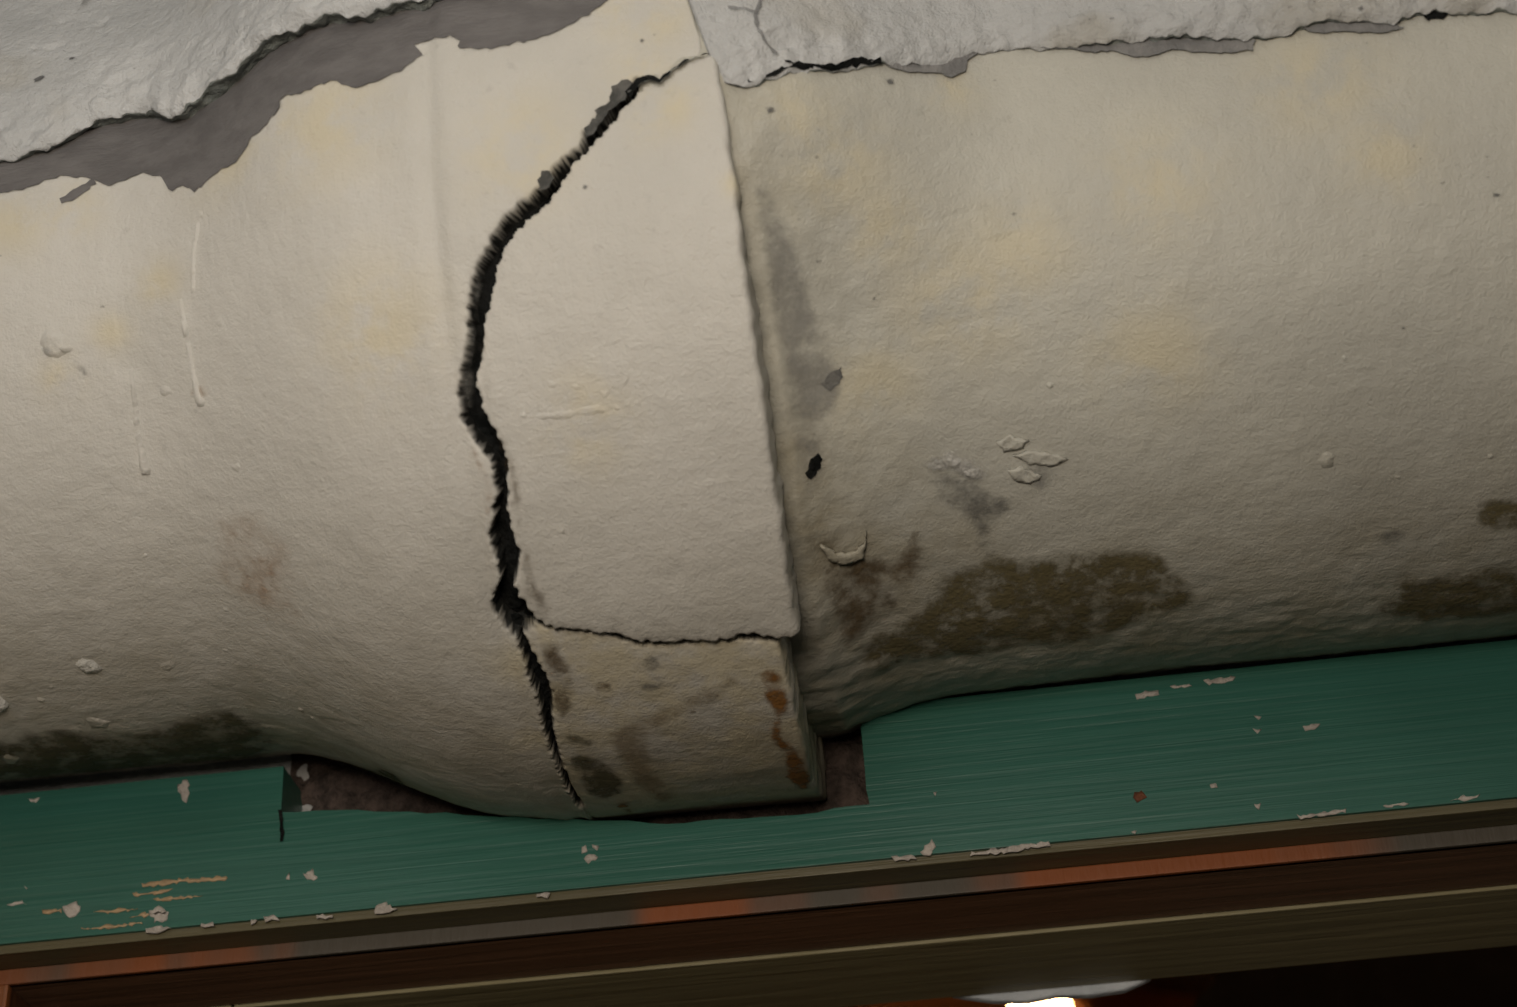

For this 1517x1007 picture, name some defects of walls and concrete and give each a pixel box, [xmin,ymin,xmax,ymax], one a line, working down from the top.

crack [728,0,882,82]
peeling [0,0,607,203]
crack [466,53,709,744]
leakage [1480,501,1517,527]
leakage [834,554,1190,669]
leakage [1382,568,1517,621]
peeling [1135,676,1235,700]
leakage [0,712,268,779]
rust [765,672,809,789]
peeling [177,779,190,803]
peeling [970,841,1051,857]
peeling [42,876,228,934]